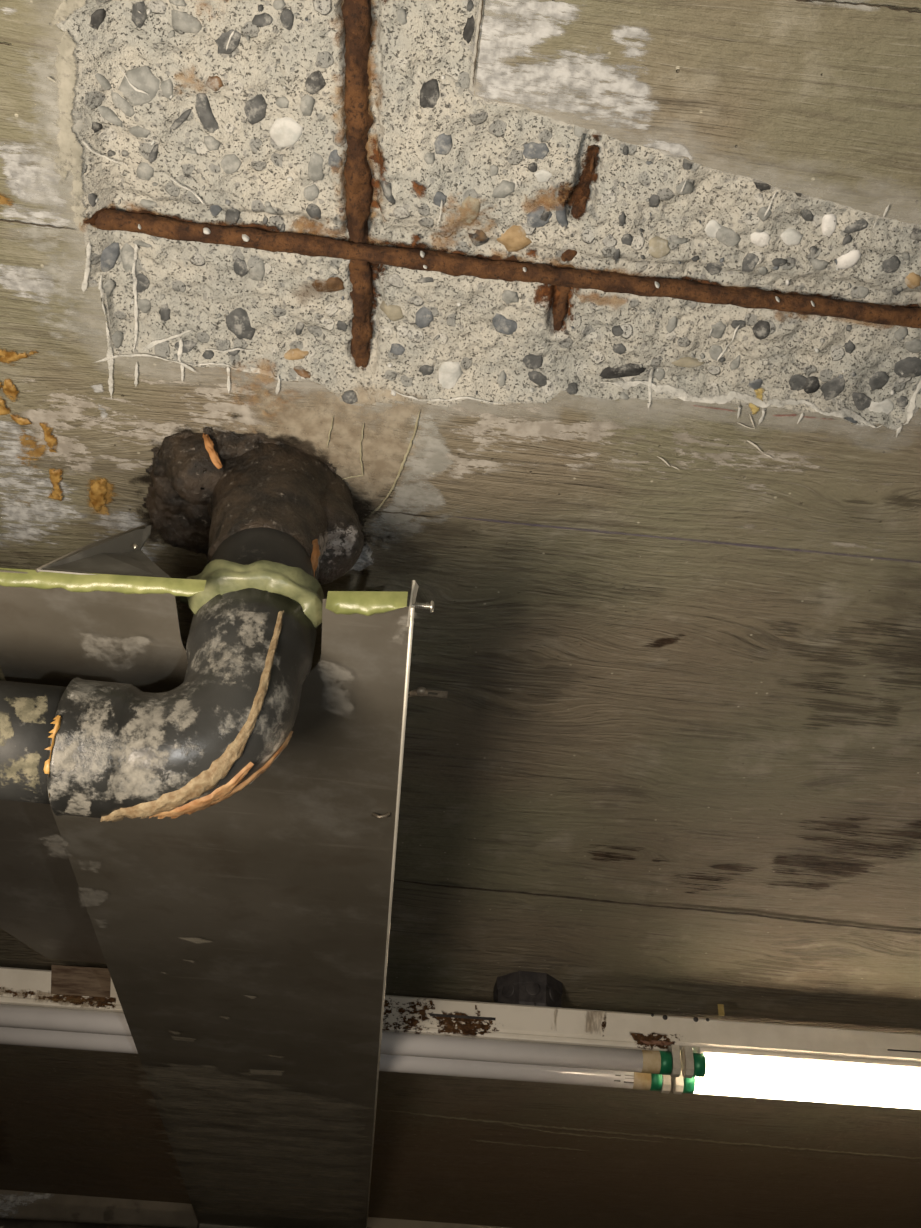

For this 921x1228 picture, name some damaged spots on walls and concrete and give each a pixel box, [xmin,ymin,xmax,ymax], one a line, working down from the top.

spalling [24,0,921,494]
corrosion [83,0,921,371]
water stain [468,0,692,160]
water stain [226,387,453,571]